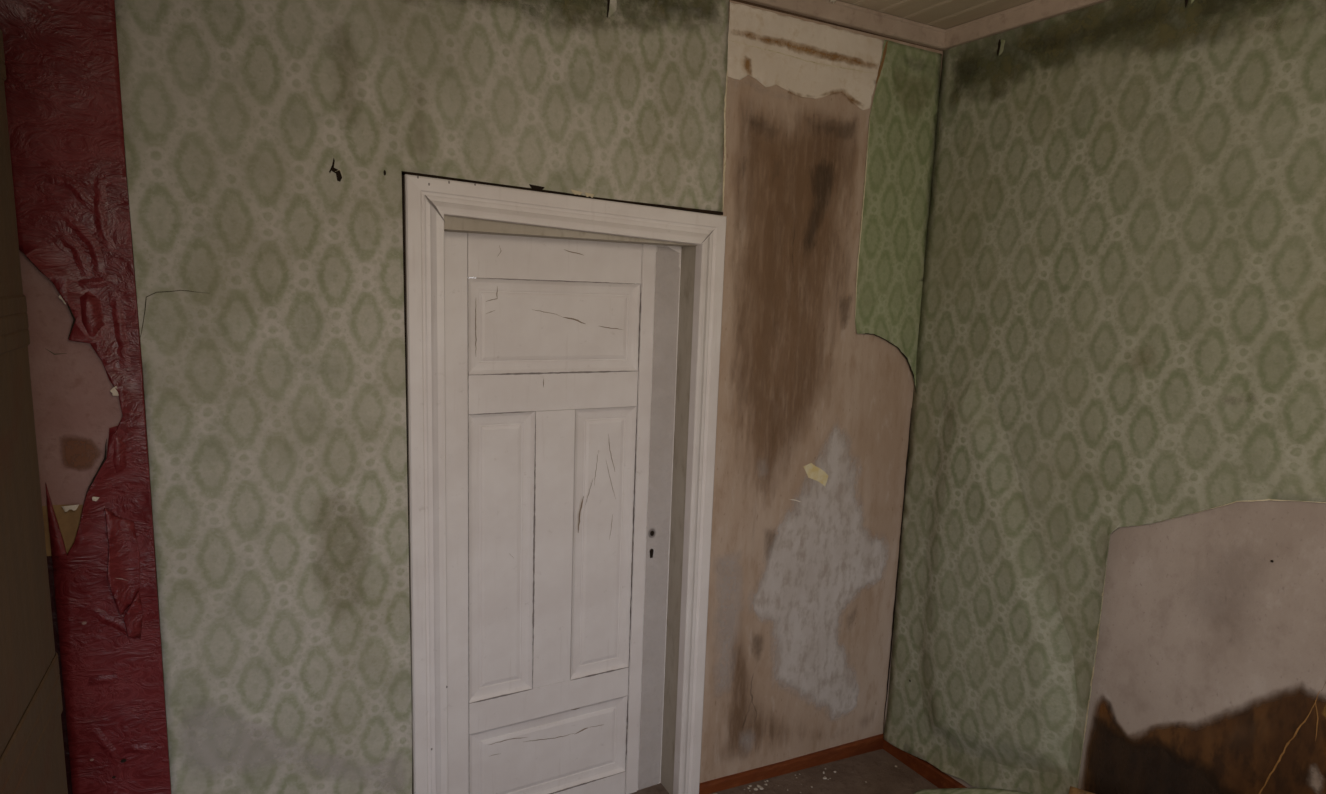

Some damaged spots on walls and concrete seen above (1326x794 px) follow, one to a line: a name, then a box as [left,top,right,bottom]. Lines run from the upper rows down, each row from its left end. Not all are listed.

leakage [551,0,714,24]
leakage [952,0,1285,101]
peeling [19,250,122,556]
leakage [744,126,843,474]
peeling [700,59,916,783]
peeling [1078,499,1326,791]
leakage [1083,688,1326,794]
crack [1259,691,1320,794]